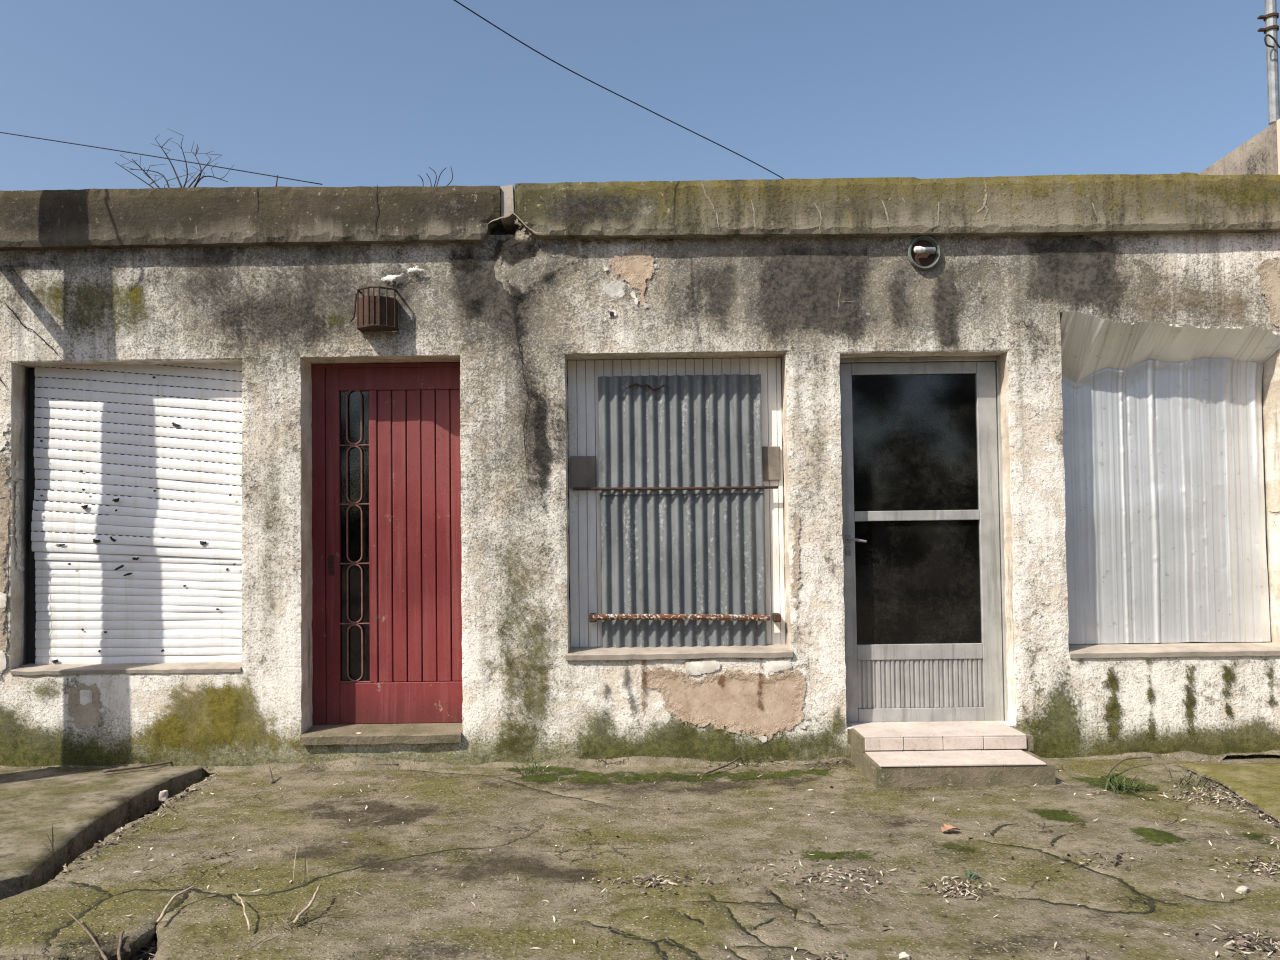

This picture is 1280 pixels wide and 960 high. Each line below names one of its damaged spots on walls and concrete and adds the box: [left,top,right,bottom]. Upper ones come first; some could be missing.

water stain [115,248,426,349]
peeling [603,249,657,308]
water stain [932,265,965,350]
peeling [1255,254,1280,335]
water stain [448,238,570,509]
peeling [0,419,24,680]
water stain [154,712,183,747]
water stain [202,684,241,746]
peeling [641,660,810,743]
water stain [1102,658,1199,756]
water stain [1219,660,1246,718]
water stain [1264,659,1278,706]